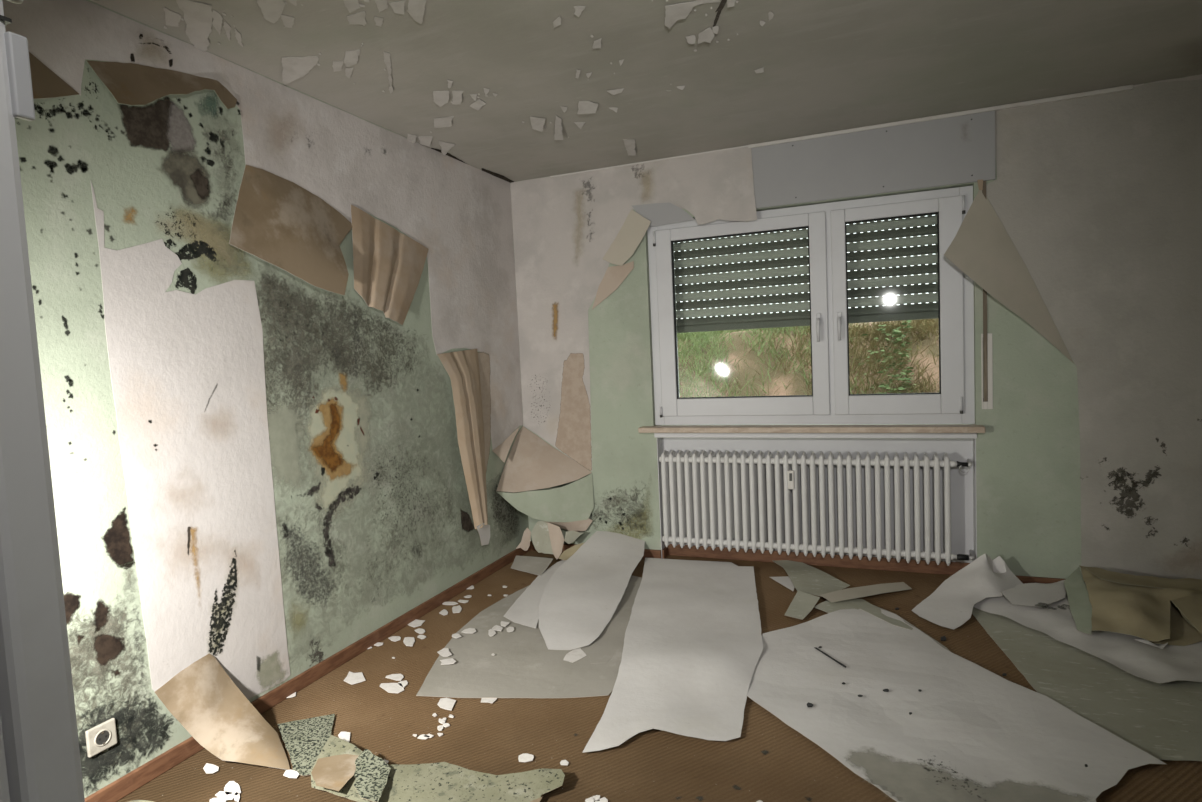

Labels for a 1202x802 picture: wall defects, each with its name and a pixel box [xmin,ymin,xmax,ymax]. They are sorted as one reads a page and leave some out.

peeling [281,43,363,85]
peeling [343,0,426,27]
peeling [652,0,739,52]
peeling [407,80,498,156]
peeling [522,88,624,140]
damp [14,69,415,419]
flaking render [632,203,695,226]
damp [1099,438,1166,538]
damp [103,508,135,578]
damp [282,454,429,627]
damp [208,551,237,656]
damp [64,593,177,793]